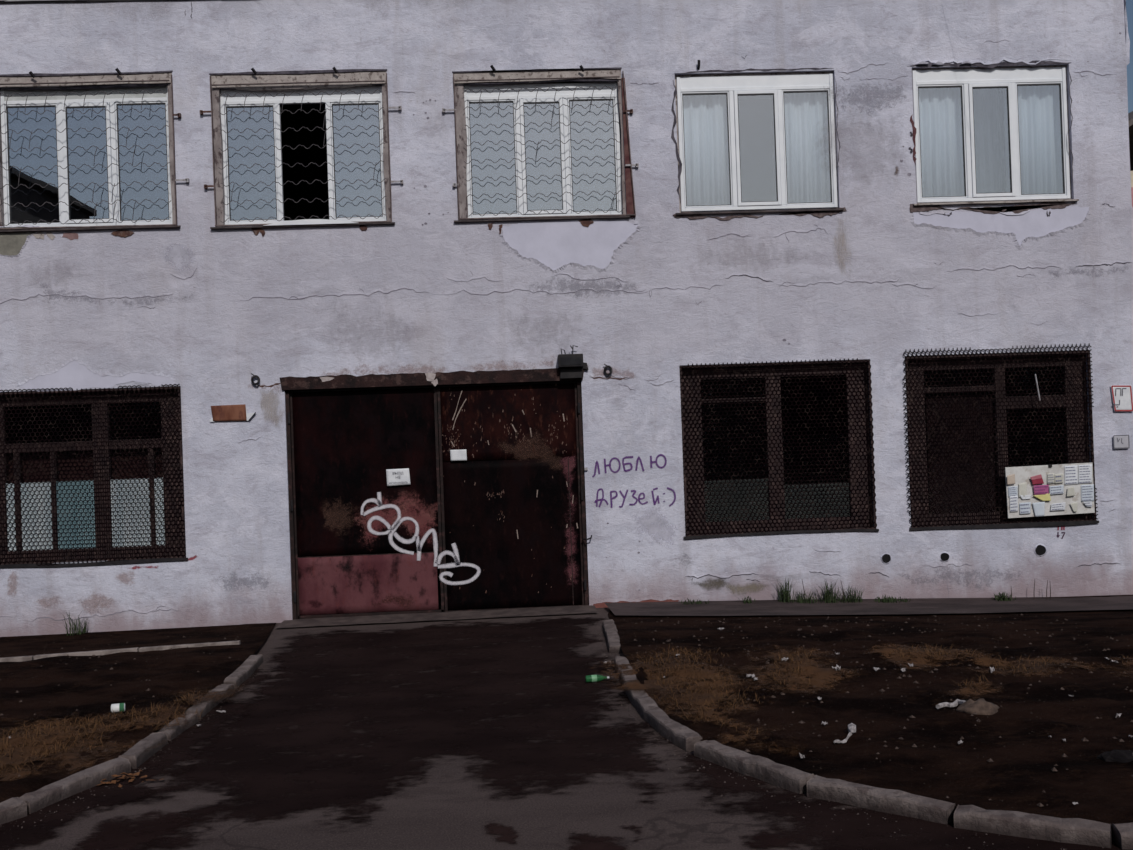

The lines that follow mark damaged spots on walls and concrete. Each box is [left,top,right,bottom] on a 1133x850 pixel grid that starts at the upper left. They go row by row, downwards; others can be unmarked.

spalling [671,80,682,203]
spalling [0,225,79,258]
peeling [499,218,641,273]
peeling [910,206,1091,250]
crack [0,267,197,309]
crack [240,260,1132,305]